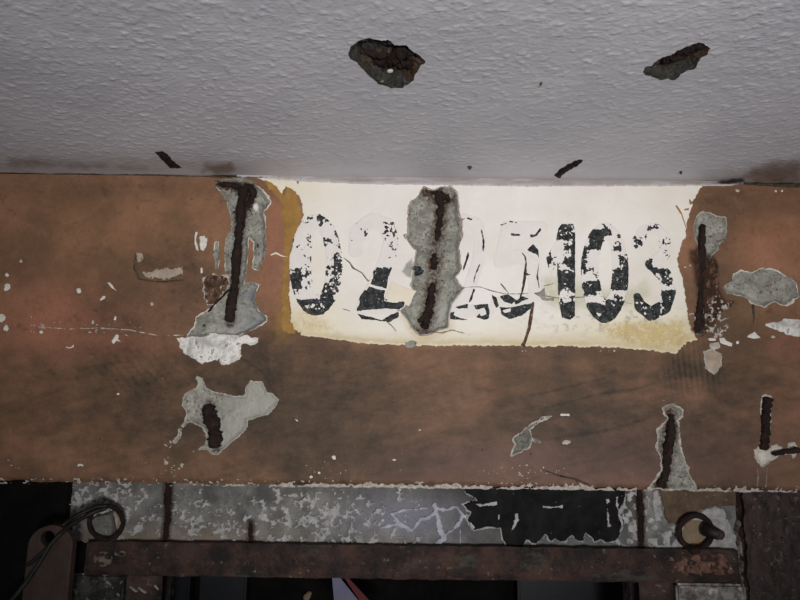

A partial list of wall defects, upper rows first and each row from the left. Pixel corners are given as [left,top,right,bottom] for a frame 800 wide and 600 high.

spalling [348,38,425,88]
spalling [643,42,710,80]
peeling [133,252,183,283]
spalling [177,177,271,365]
spalling [401,186,463,348]
spalling [684,211,800,375]
spalling [164,376,279,455]
spalling [754,394,800,468]
peeling [65,404,798,596]